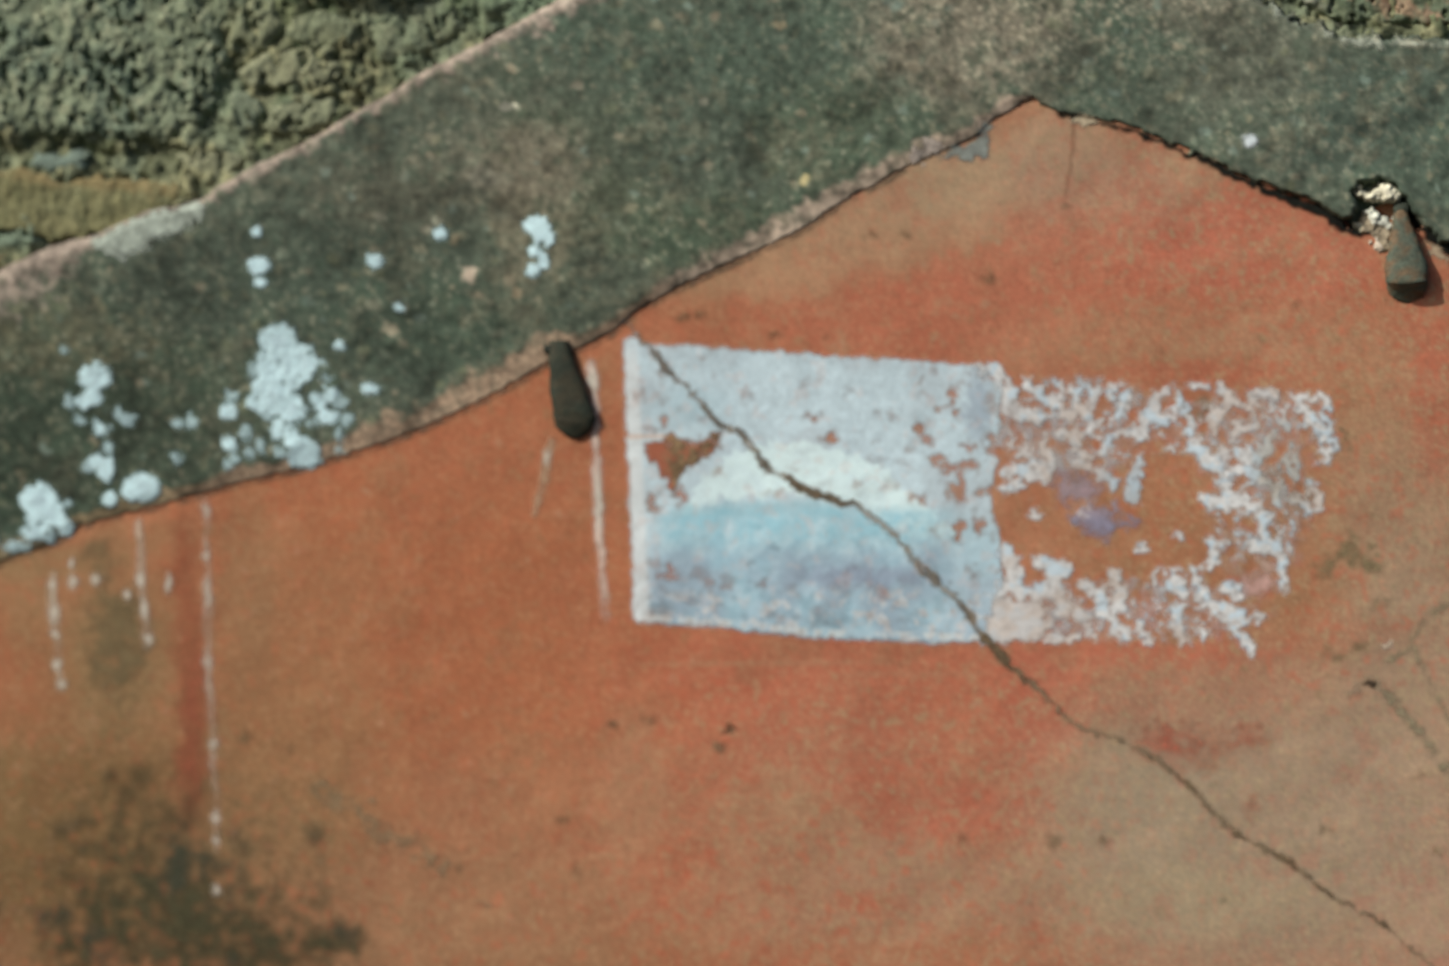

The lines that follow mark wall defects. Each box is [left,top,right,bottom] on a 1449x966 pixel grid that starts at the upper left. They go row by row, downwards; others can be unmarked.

peeling [647,434,718,490]
peeling [975,362,1339,658]
leakage [49,559,99,637]
leakage [95,520,152,685]
crack [626,321,1352,906]
leakage [39,813,358,966]